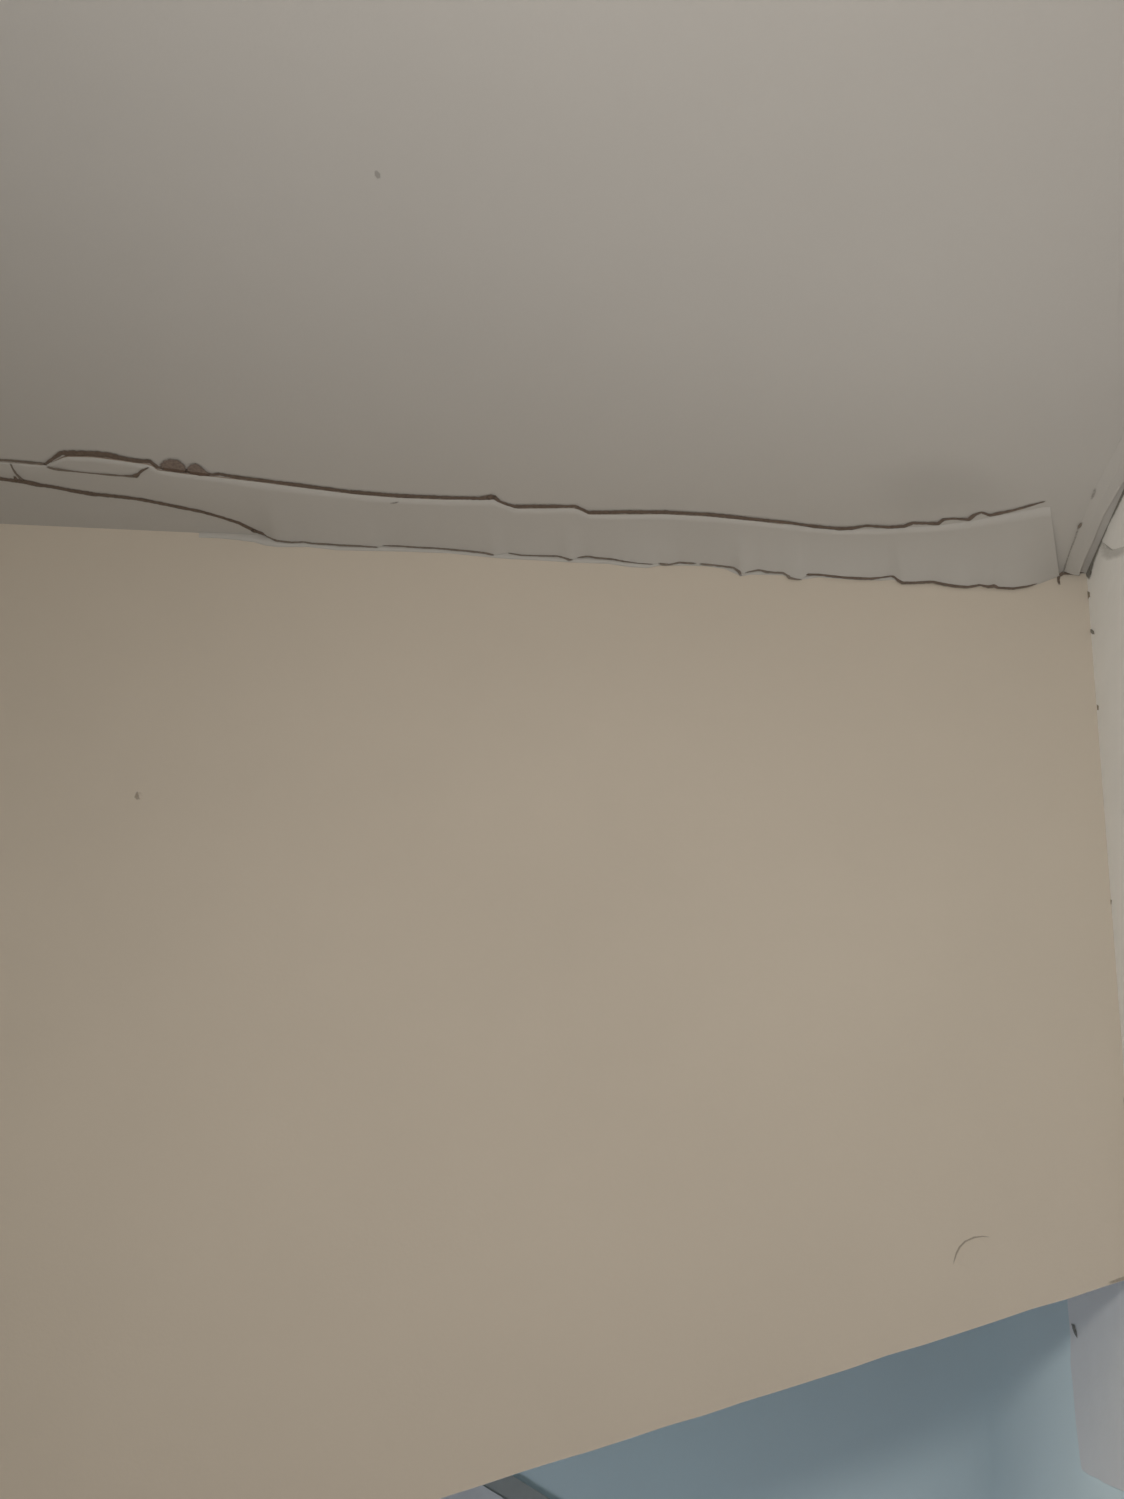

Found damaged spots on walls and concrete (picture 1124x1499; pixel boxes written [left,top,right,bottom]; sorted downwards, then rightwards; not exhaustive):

crack [0,450,1124,590]